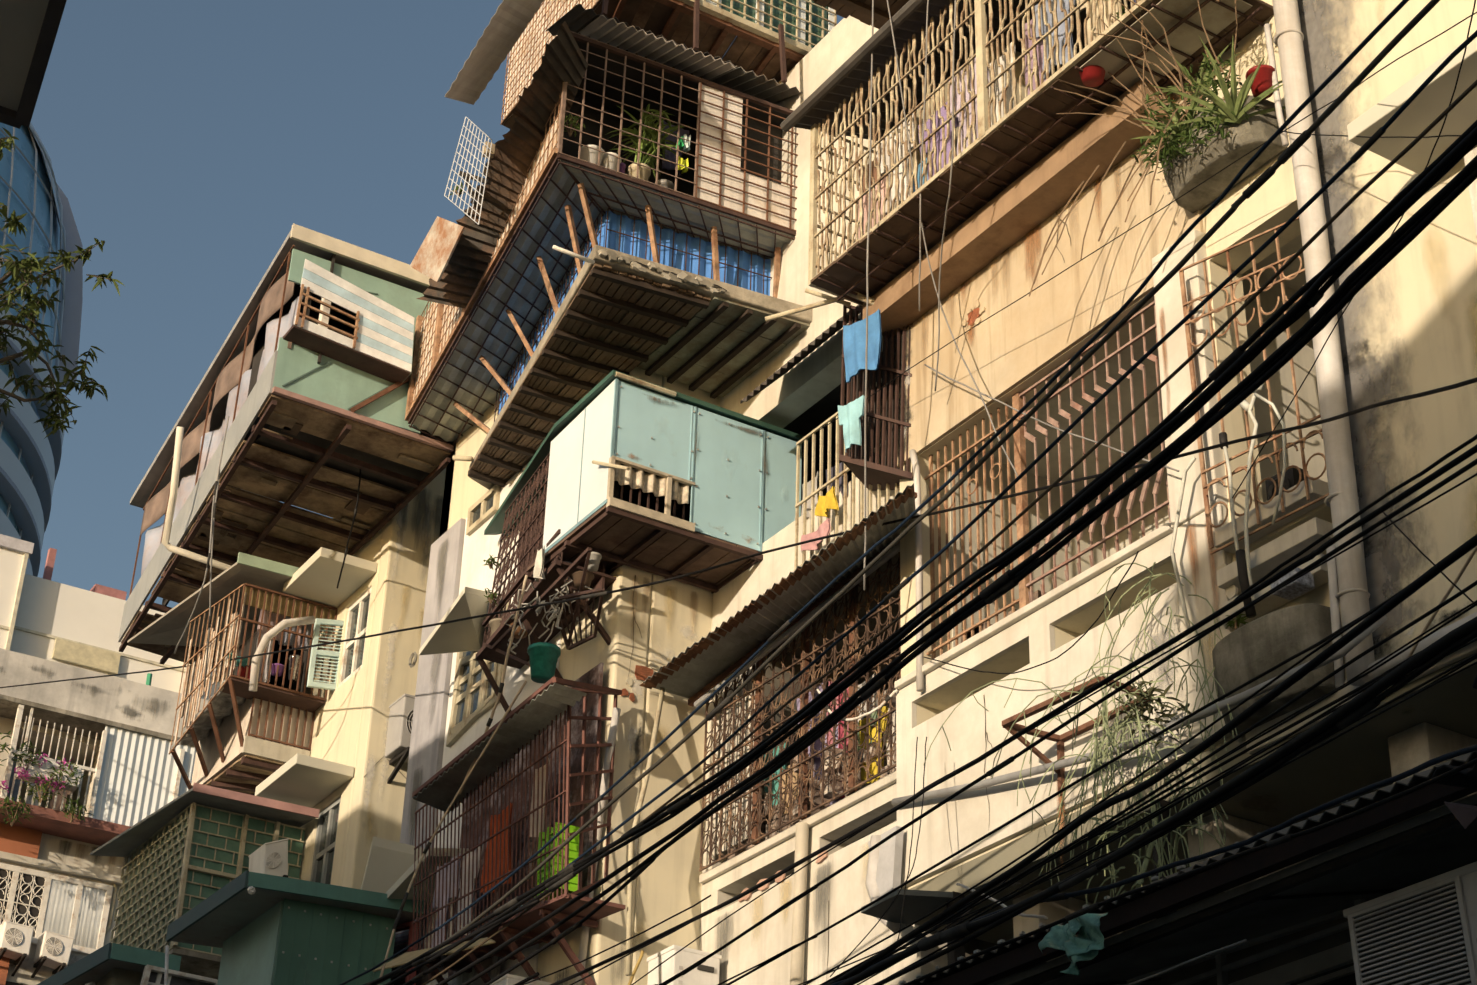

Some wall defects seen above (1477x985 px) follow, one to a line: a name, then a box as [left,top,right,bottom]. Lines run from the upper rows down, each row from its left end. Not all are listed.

water stain [1297,0,1354,259]
water stain [1334,262,1412,658]